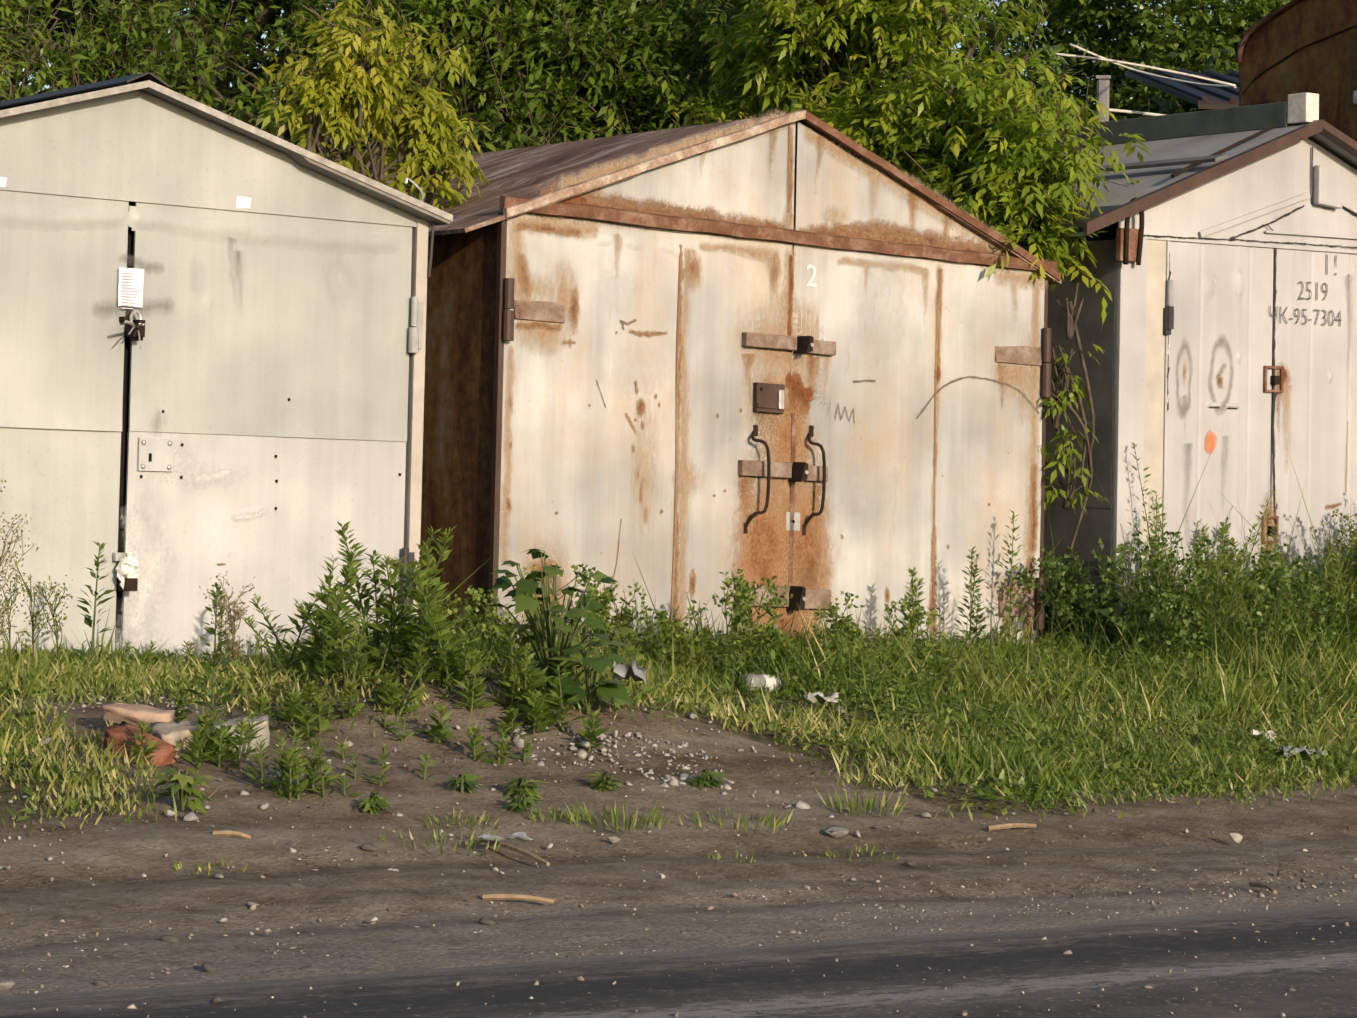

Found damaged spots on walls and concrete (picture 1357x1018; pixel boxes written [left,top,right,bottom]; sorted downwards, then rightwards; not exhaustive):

corrosion [502,114,1044,635]
corrosion [745,606,821,652]